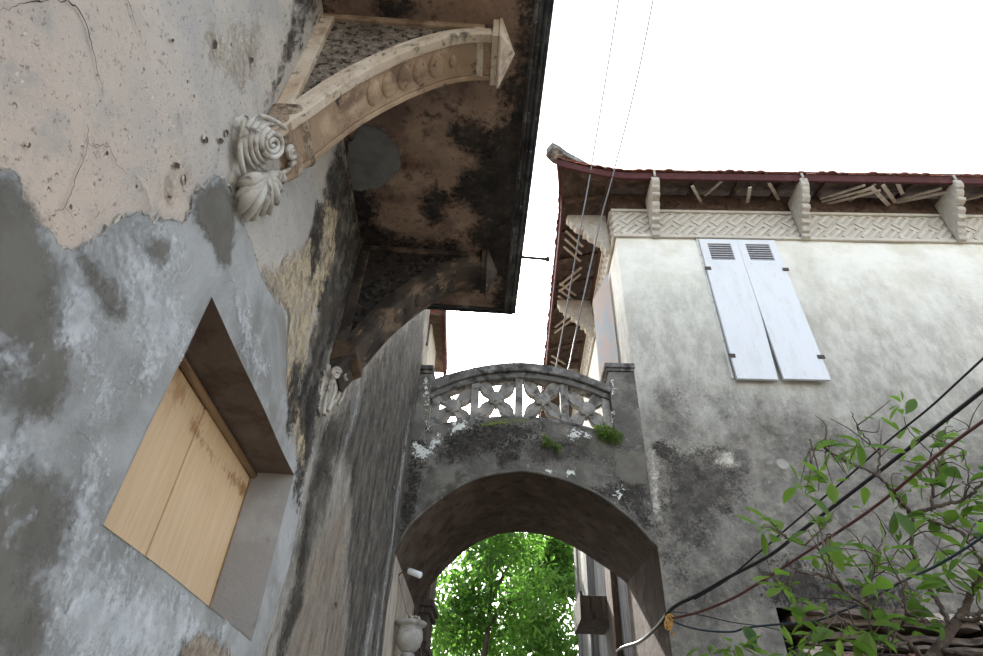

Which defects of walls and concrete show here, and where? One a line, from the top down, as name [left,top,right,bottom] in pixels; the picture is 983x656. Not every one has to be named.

crack [0,0,104,96]
damp [267,0,334,102]
crack [55,125,127,223]
spalling [41,162,235,251]
flaking render [240,196,338,476]
damp [278,0,592,656]
damp [592,444,752,584]